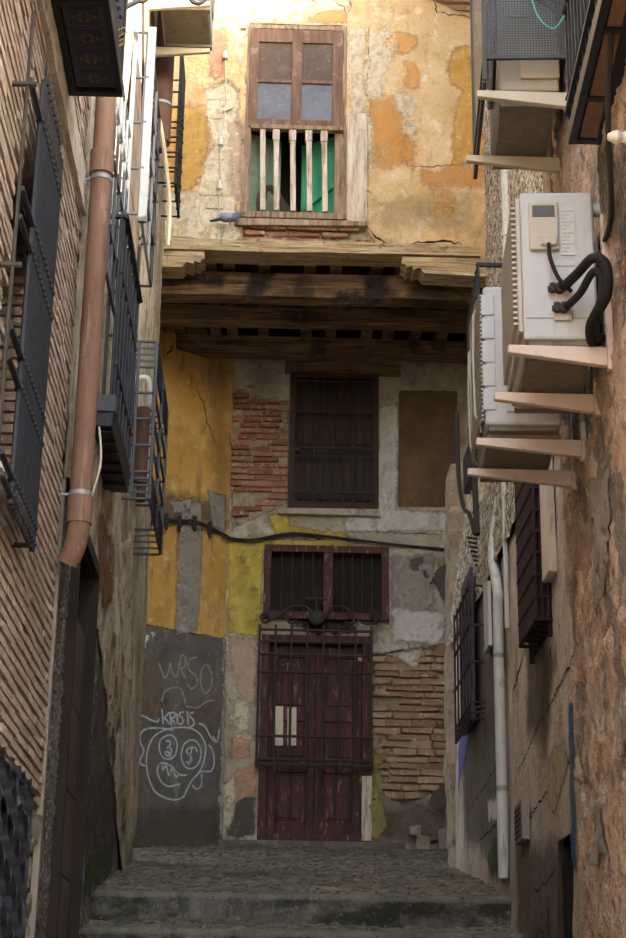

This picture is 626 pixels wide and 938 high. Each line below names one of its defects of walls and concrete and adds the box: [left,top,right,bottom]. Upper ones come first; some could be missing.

flaking render [164,0,420,243]
crack [364,25,372,124]
peeling [447,45,484,165]
crack [195,387,218,447]
flaking render [170,386,447,841]